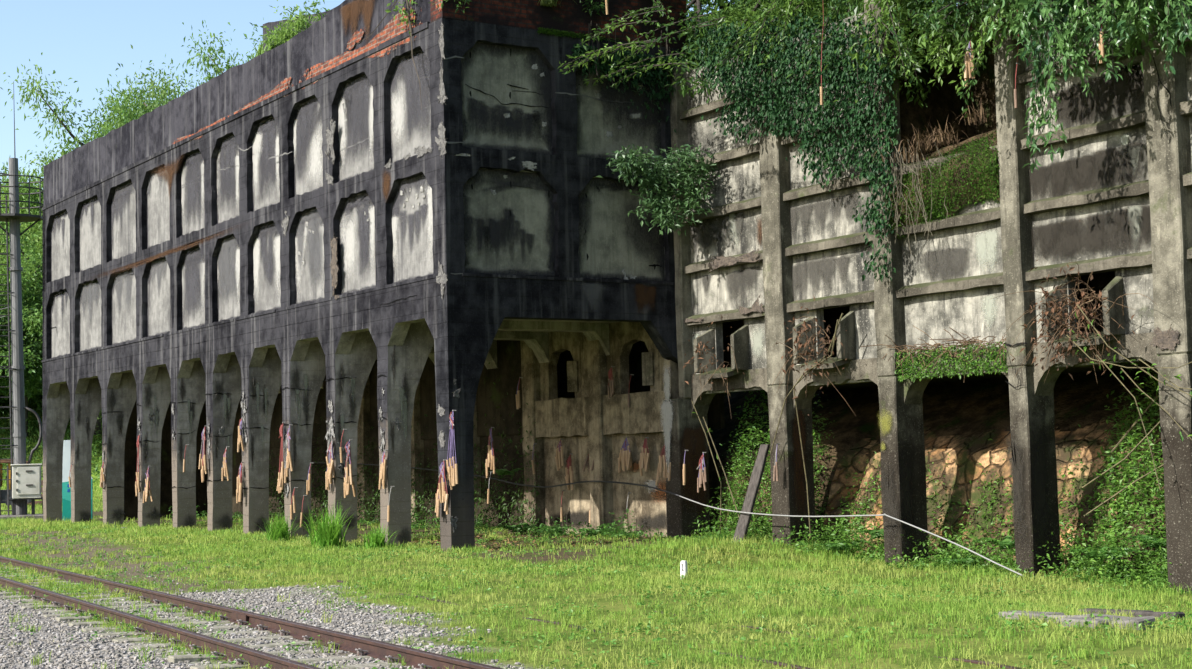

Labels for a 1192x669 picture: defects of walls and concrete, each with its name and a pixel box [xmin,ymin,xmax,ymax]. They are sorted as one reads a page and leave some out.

spalling [173,0,448,144]
leakage [460,42,553,155]
leakage [1054,63,1144,125]
leakage [1029,134,1143,197]
leakage [463,168,555,276]
leakage [578,178,665,306]
leakage [1031,205,1151,258]